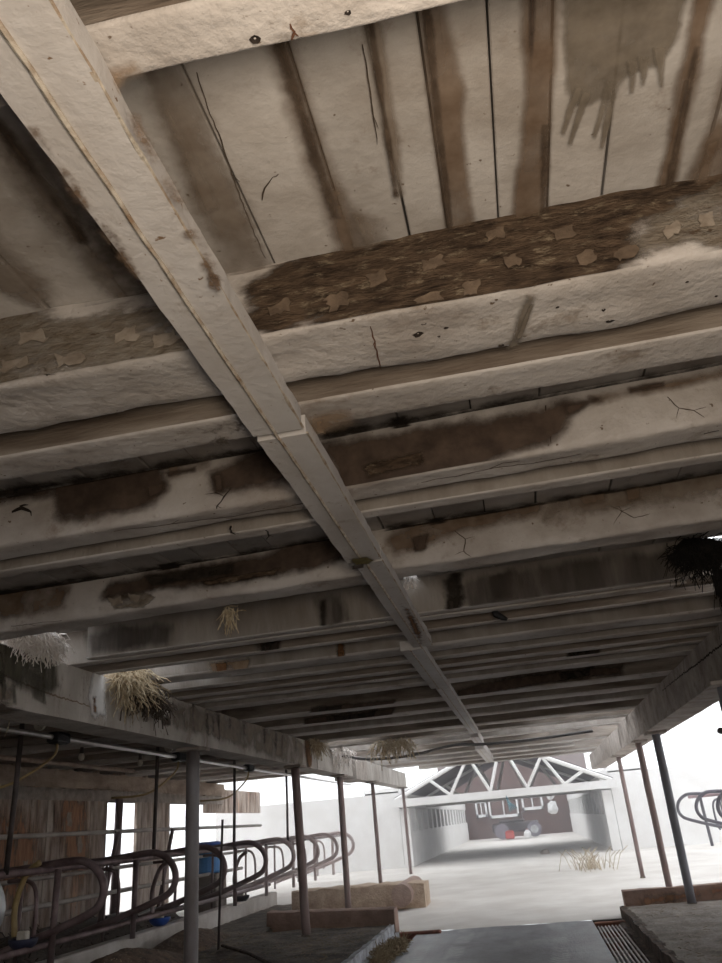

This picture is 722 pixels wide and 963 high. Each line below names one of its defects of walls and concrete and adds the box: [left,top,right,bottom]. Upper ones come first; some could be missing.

water stain [0,122,149,298]
peeling [244,174,722,333]
water stain [514,0,712,218]
water stain [689,121,722,183]
peeling [0,306,190,383]
crack [668,397,719,434]